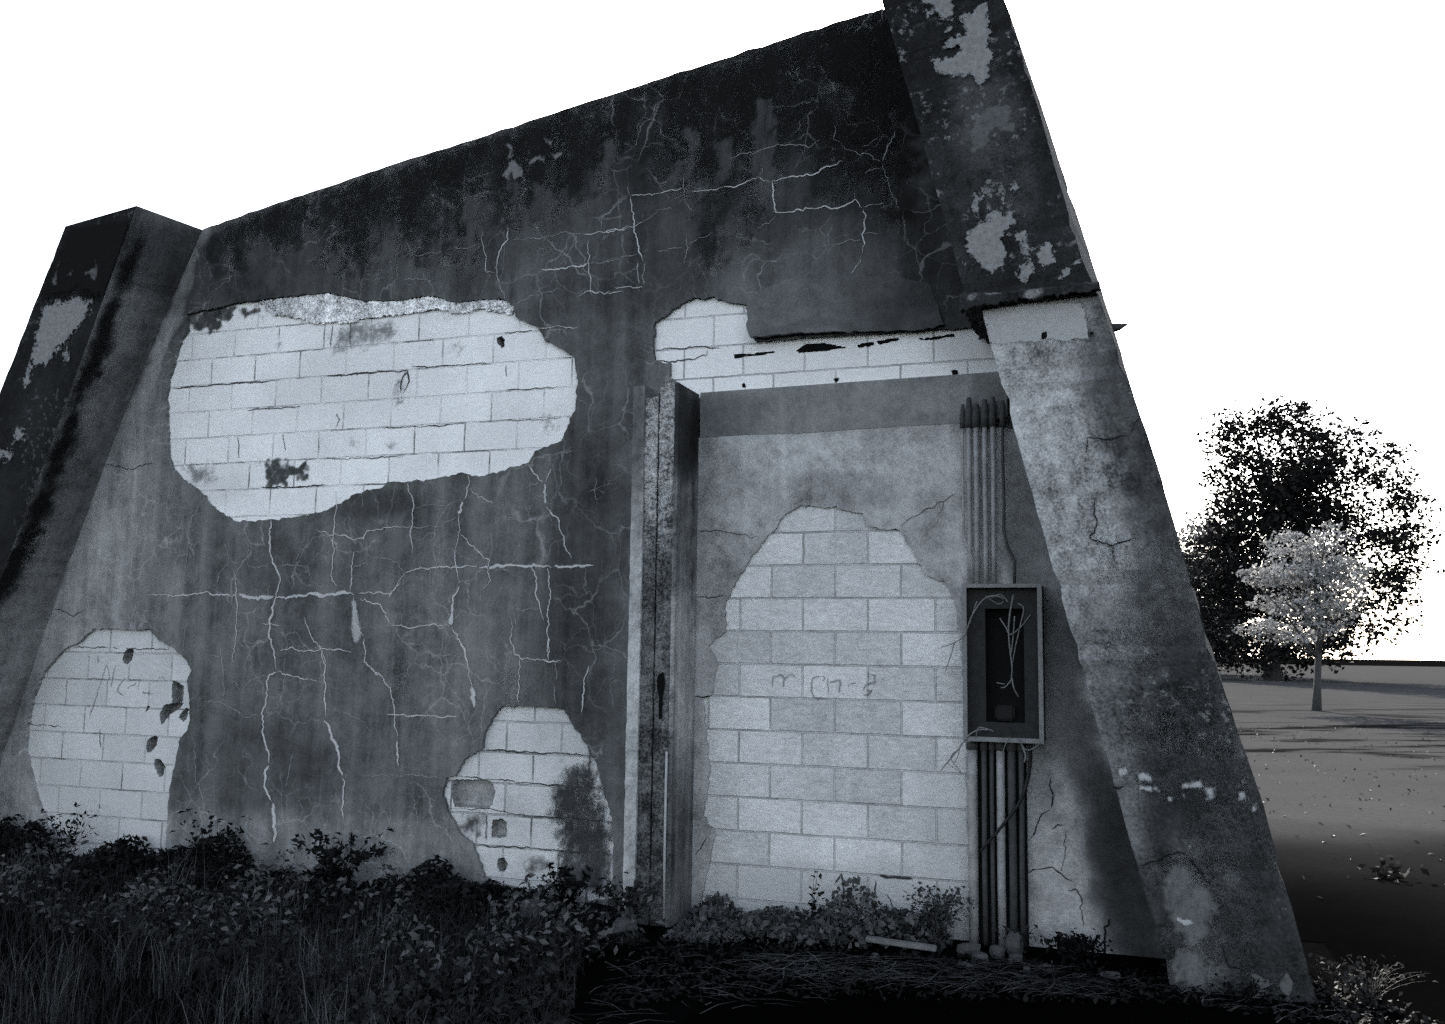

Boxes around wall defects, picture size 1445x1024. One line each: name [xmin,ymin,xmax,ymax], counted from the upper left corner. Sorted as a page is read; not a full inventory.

peeling [922,0,997,90]
water stain [503,141,562,179]
crack [404,128,897,334]
spalling [168,293,578,522]
spalling [655,298,998,398]
crack [1089,501,1135,561]
crack [1086,418,1140,453]
spalling [28,629,191,856]
crack [107,463,593,842]
spalling [445,706,614,902]
spalling [701,505,969,922]
crack [1028,779,1110,953]